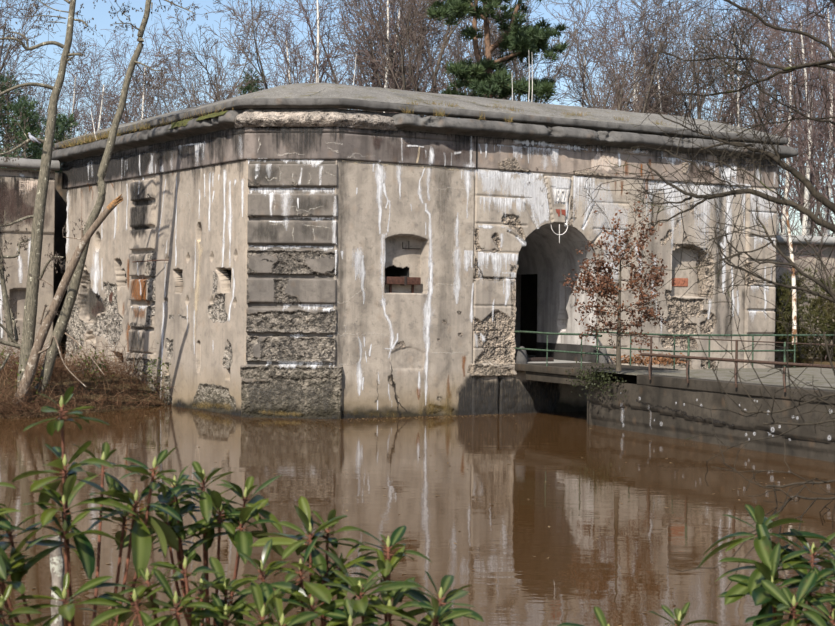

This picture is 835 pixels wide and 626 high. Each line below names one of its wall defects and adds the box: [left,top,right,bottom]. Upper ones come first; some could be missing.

leakage [79,253,105,319]
spalling [65,251,156,357]
leakage [50,127,244,253]
spalling [192,249,343,419]
leakage [199,158,343,321]
crack [377,299,407,415]
spalling [467,228,518,377]
spalling [501,212,526,240]
leakage [255,126,777,416]